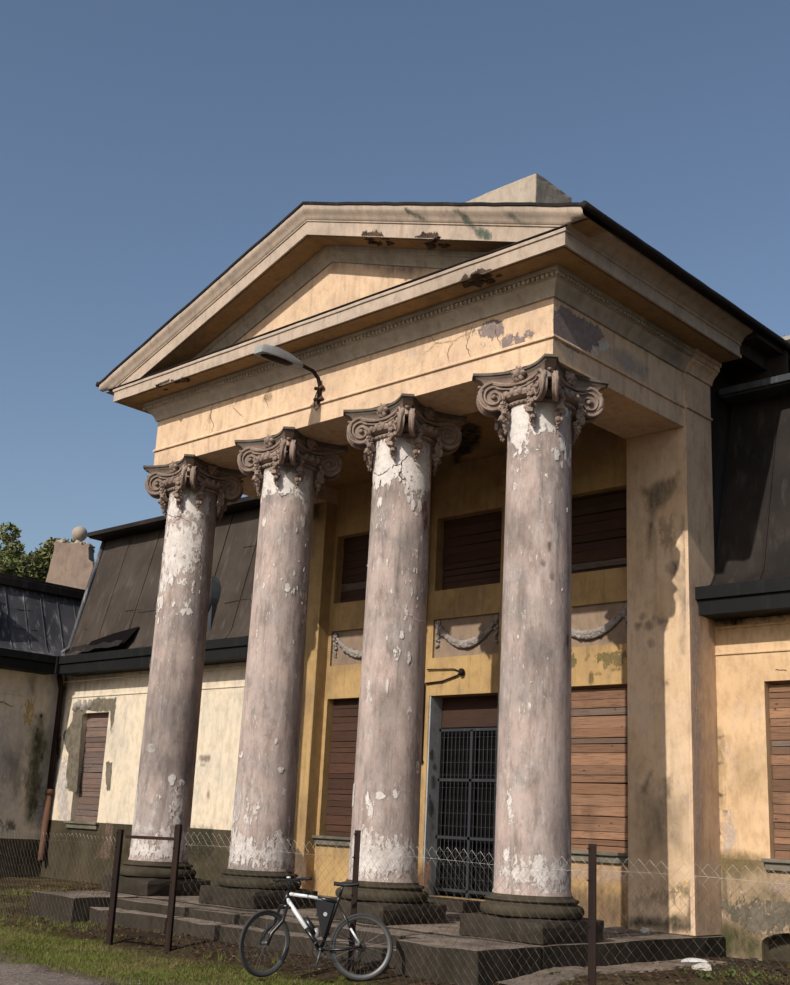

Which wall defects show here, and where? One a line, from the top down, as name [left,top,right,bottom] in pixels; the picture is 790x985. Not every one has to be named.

damp [458,210,490,240]
crack [429,323,502,356]
flaking render [465,318,534,348]
flaking render [553,305,612,358]
peeling [507,402,572,490]
peeling [260,469,311,532]
peeling [155,491,211,624]
peeling [372,437,430,664]
flaking render [57,697,117,821]
peeling [130,774,191,860]
peeling [228,785,306,883]
peeling [349,783,418,880]